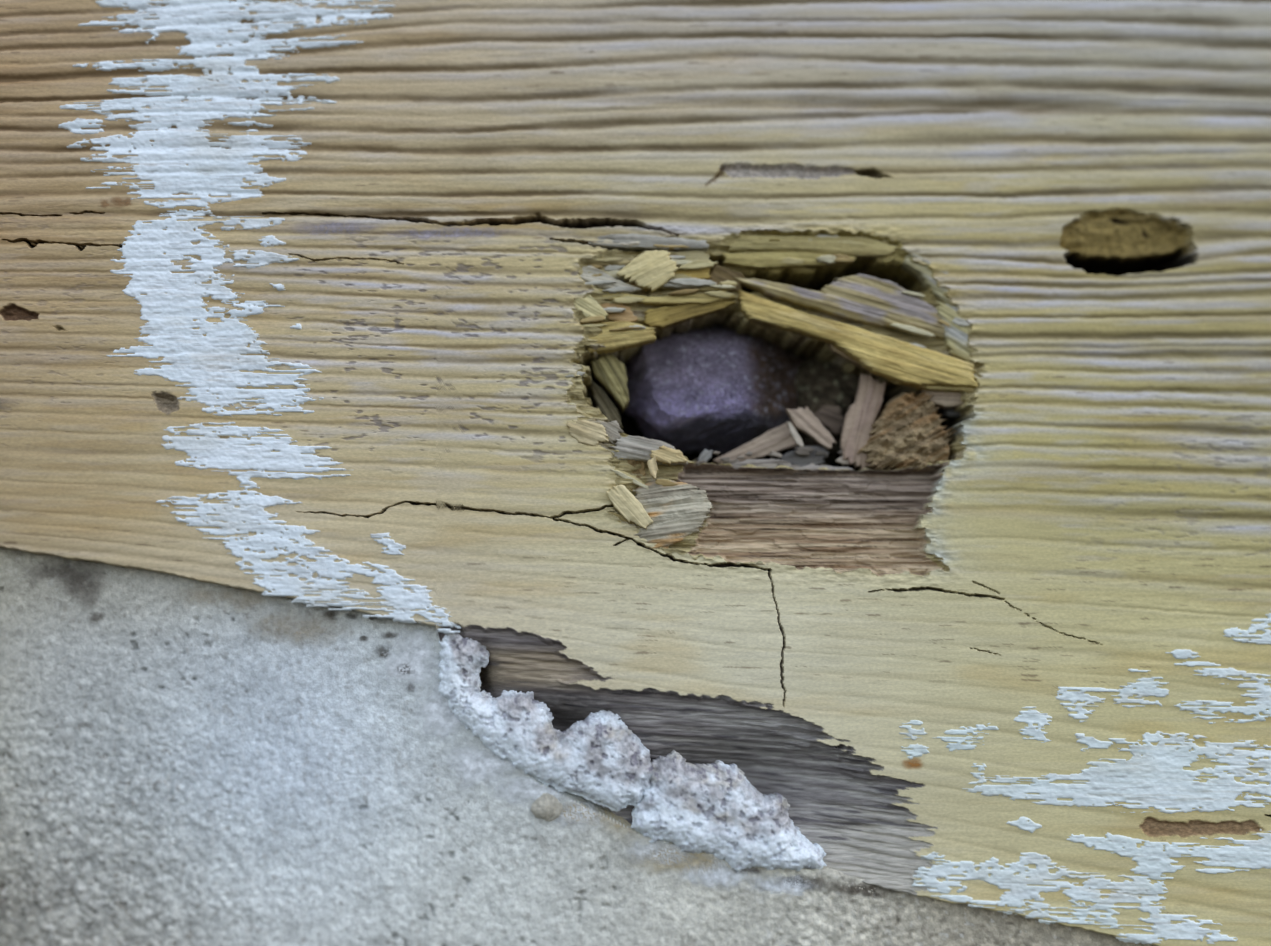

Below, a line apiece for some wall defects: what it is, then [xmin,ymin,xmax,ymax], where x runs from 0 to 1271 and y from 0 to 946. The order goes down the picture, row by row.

crack [0,210,125,251]
peeling [58,0,461,634]
spalling [565,229,986,578]
water stain [379,632,438,690]
crack [296,499,787,708]
crack [867,580,1103,646]
peeling [1223,610,1271,644]
peeling [899,649,1271,814]
water stain [452,749,630,827]
peeling [1007,816,1042,833]
water stain [635,843,746,886]
peeling [912,829,1271,944]